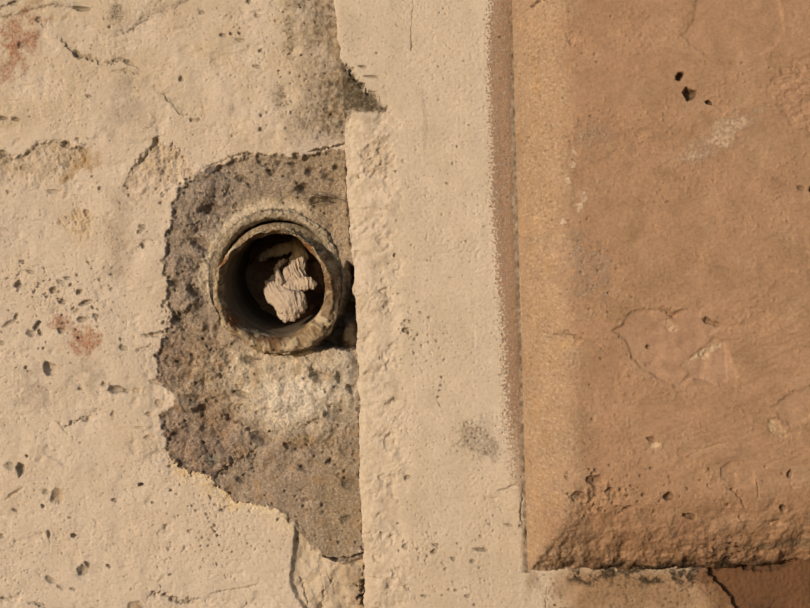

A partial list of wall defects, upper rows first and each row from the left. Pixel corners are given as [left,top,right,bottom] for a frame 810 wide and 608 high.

crack [0,0,143,75]
crack [112,0,191,37]
spalling [340,58,387,119]
spalling [314,260,358,353]
peeling [610,306,741,391]
spalling [168,457,365,608]